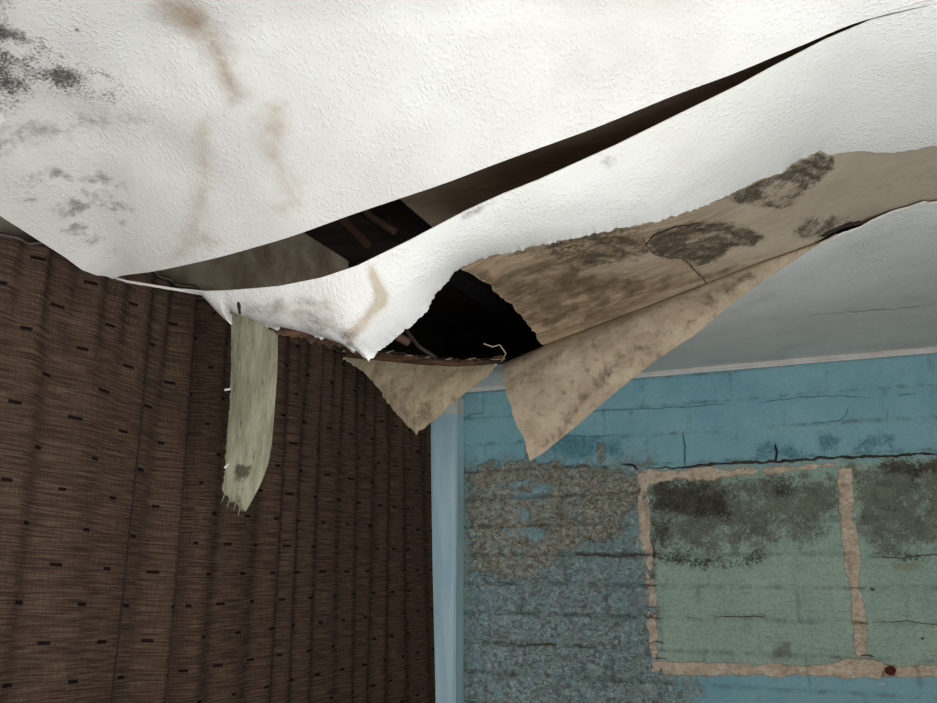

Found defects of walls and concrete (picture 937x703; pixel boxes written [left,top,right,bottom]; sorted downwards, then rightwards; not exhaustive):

damp [0,21,110,98]
damp [733,153,834,208]
peeling [343,233,837,464]
peeling [222,311,278,515]
crack [593,404,720,412]
crack [621,434,937,470]
damp [647,474,839,571]
damp [846,458,937,567]
peeling [464,537,683,703]